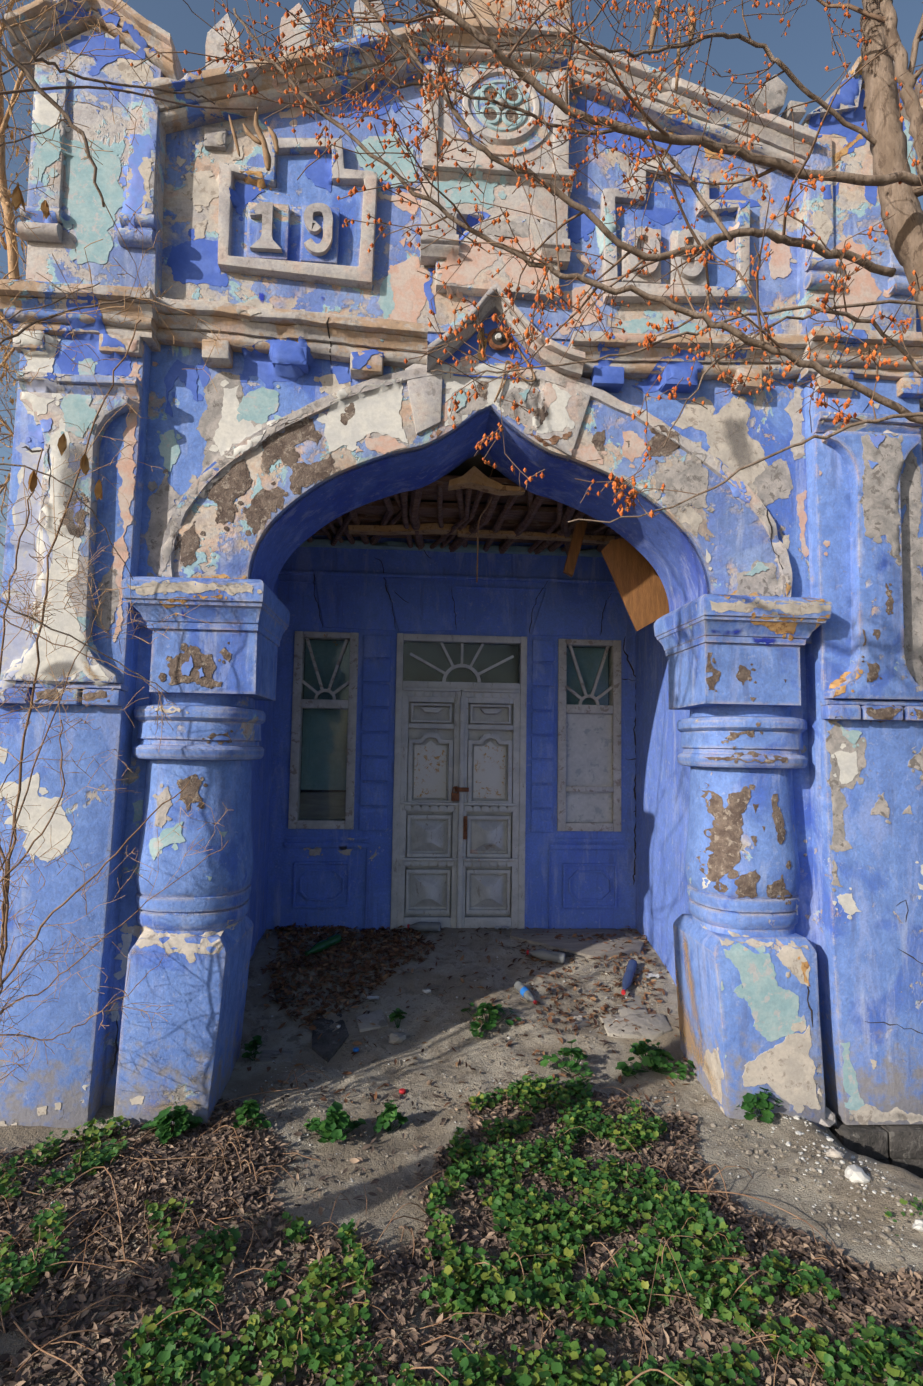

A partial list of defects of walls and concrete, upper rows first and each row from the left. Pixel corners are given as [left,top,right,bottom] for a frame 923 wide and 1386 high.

peeling [26,93,165,264]
peeling [167,132,273,323]
peeling [769,182,897,323]
flaking render [354,132,831,641]
peeling [0,290,409,707]
flaking render [859,430,923,687]
peeling [0,772,73,863]
flaking render [696,783,807,915]
peeling [720,931,826,1113]
peeling [825,705,923,919]
crack [865,1021,923,1034]
crack [896,900,923,966]